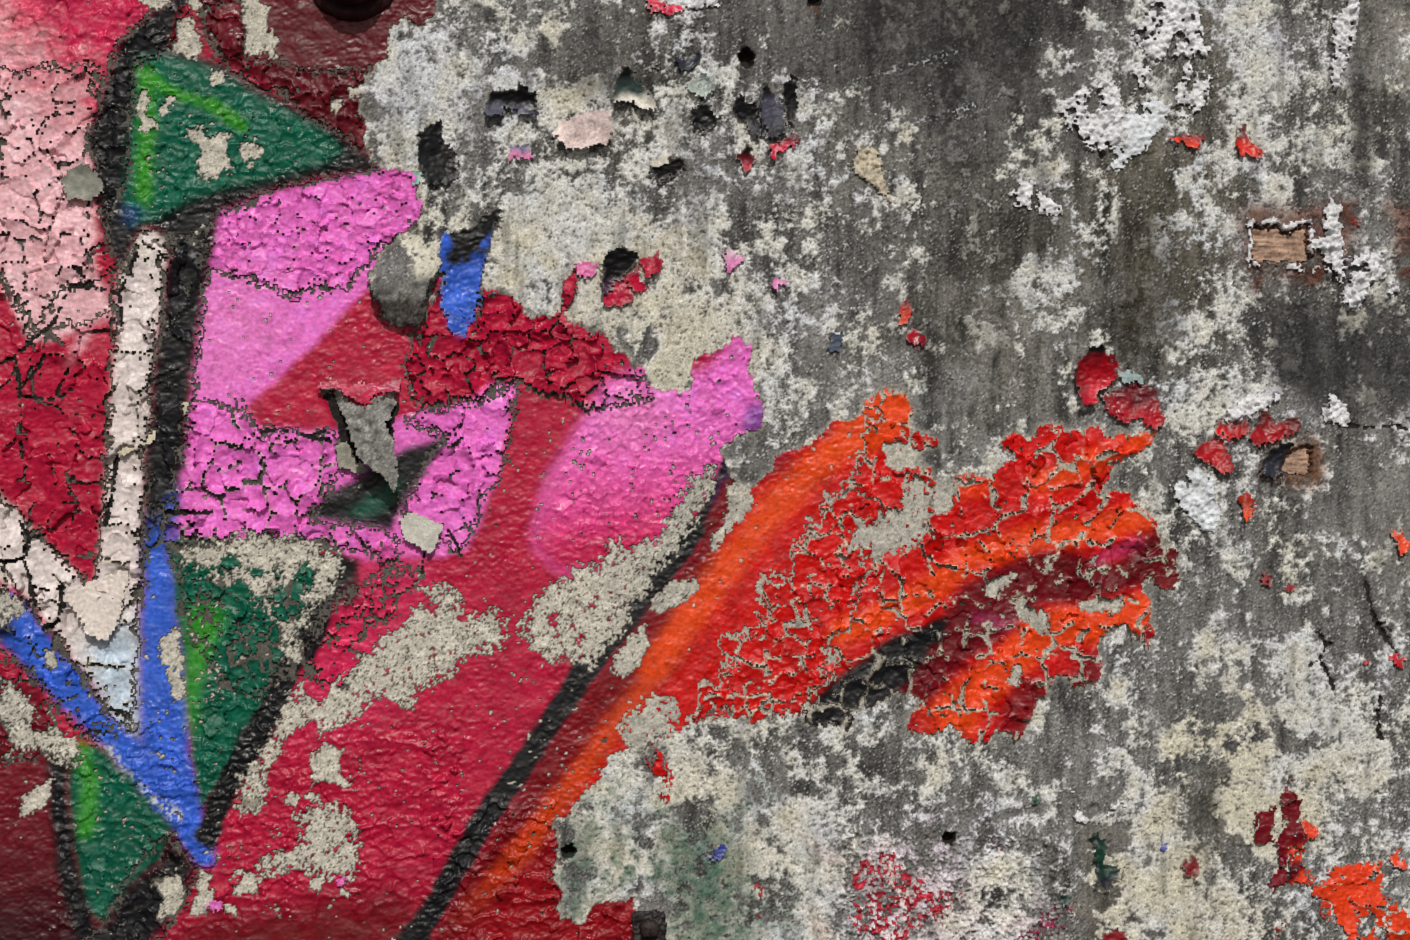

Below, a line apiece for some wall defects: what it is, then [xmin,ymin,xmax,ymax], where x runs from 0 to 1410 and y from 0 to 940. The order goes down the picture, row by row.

peeling [552,52,801,173]
crack [0,252,139,459]
spalling [1194,300,1410,480]
crack [103,456,120,527]
peeling [0,0,755,940]
peeling [619,343,1180,803]
crack [1308,629,1335,691]
crack [1375,695,1386,740]
crack [1364,581,1398,656]
peeling [1253,778,1410,940]
peeling [1100,927,1128,940]